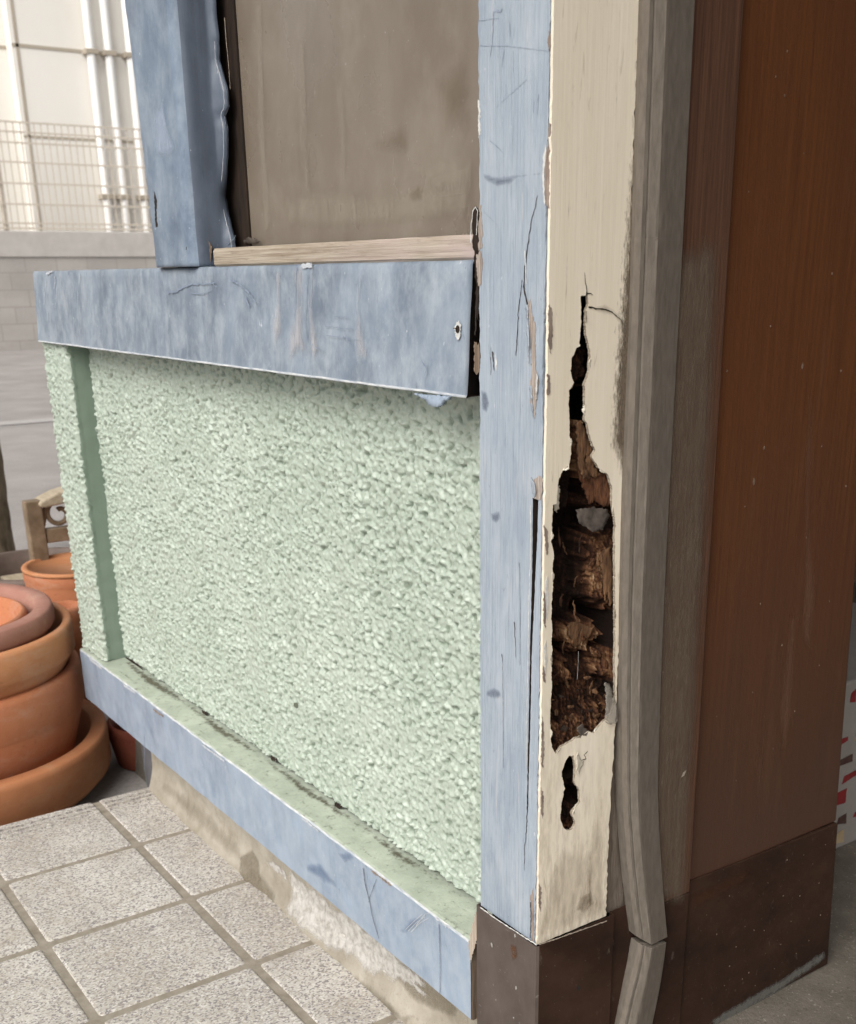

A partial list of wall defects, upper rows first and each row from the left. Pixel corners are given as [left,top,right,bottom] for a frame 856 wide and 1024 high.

peeling [516,123,553,417]
crack [584,272,625,326]
peeling [575,506,610,532]
damp [240,852,272,900]
damp [399,964,455,1013]